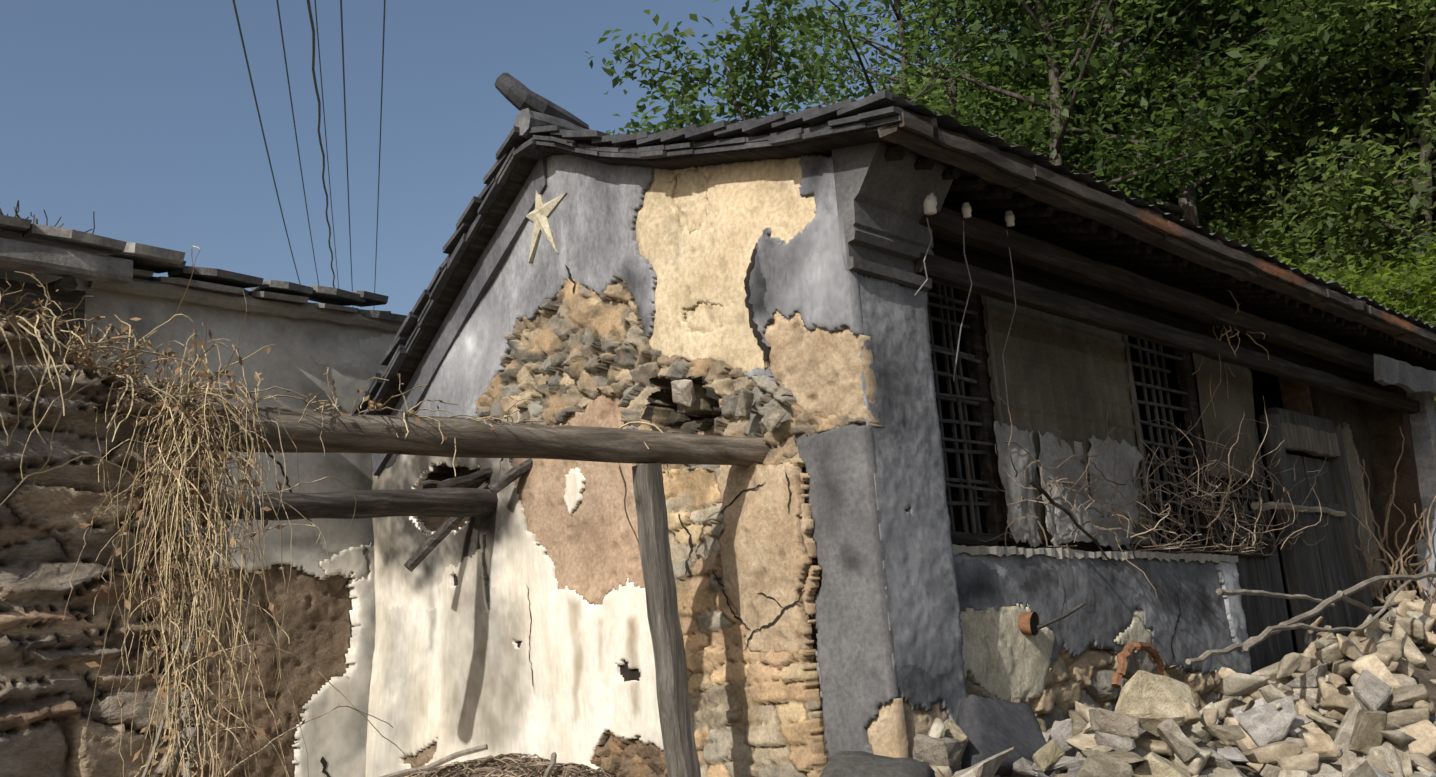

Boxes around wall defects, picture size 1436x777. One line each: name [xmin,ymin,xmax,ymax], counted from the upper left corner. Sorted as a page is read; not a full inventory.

flaking render [549,157,880,434]
flaking render [511,458,645,605]
flaking render [189,564,353,777]
spalling [590,730,668,777]
crack [678,464,828,761]
spalling [867,698,949,758]
flaking render [959,603,1055,702]